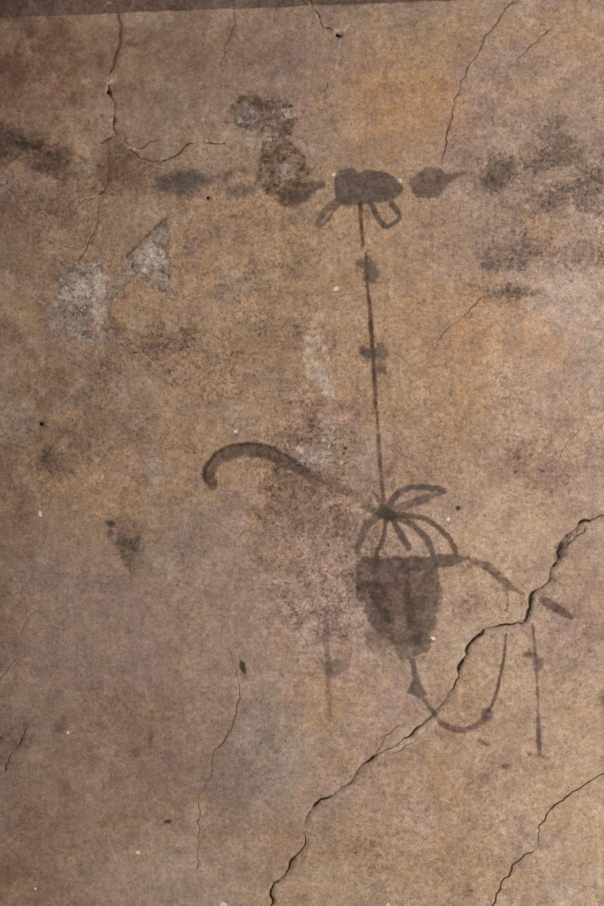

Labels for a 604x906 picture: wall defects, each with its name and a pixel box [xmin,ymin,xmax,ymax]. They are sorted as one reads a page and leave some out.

crack [106,59,116,141]
crack [132,141,226,162]
crack [441,112,453,160]
spalling [47,222,172,347]
crack [452,519,591,689]
crack [222,686,241,744]
crack [363,724,424,764]
crack [270,836,306,906]
crack [492,774,604,906]